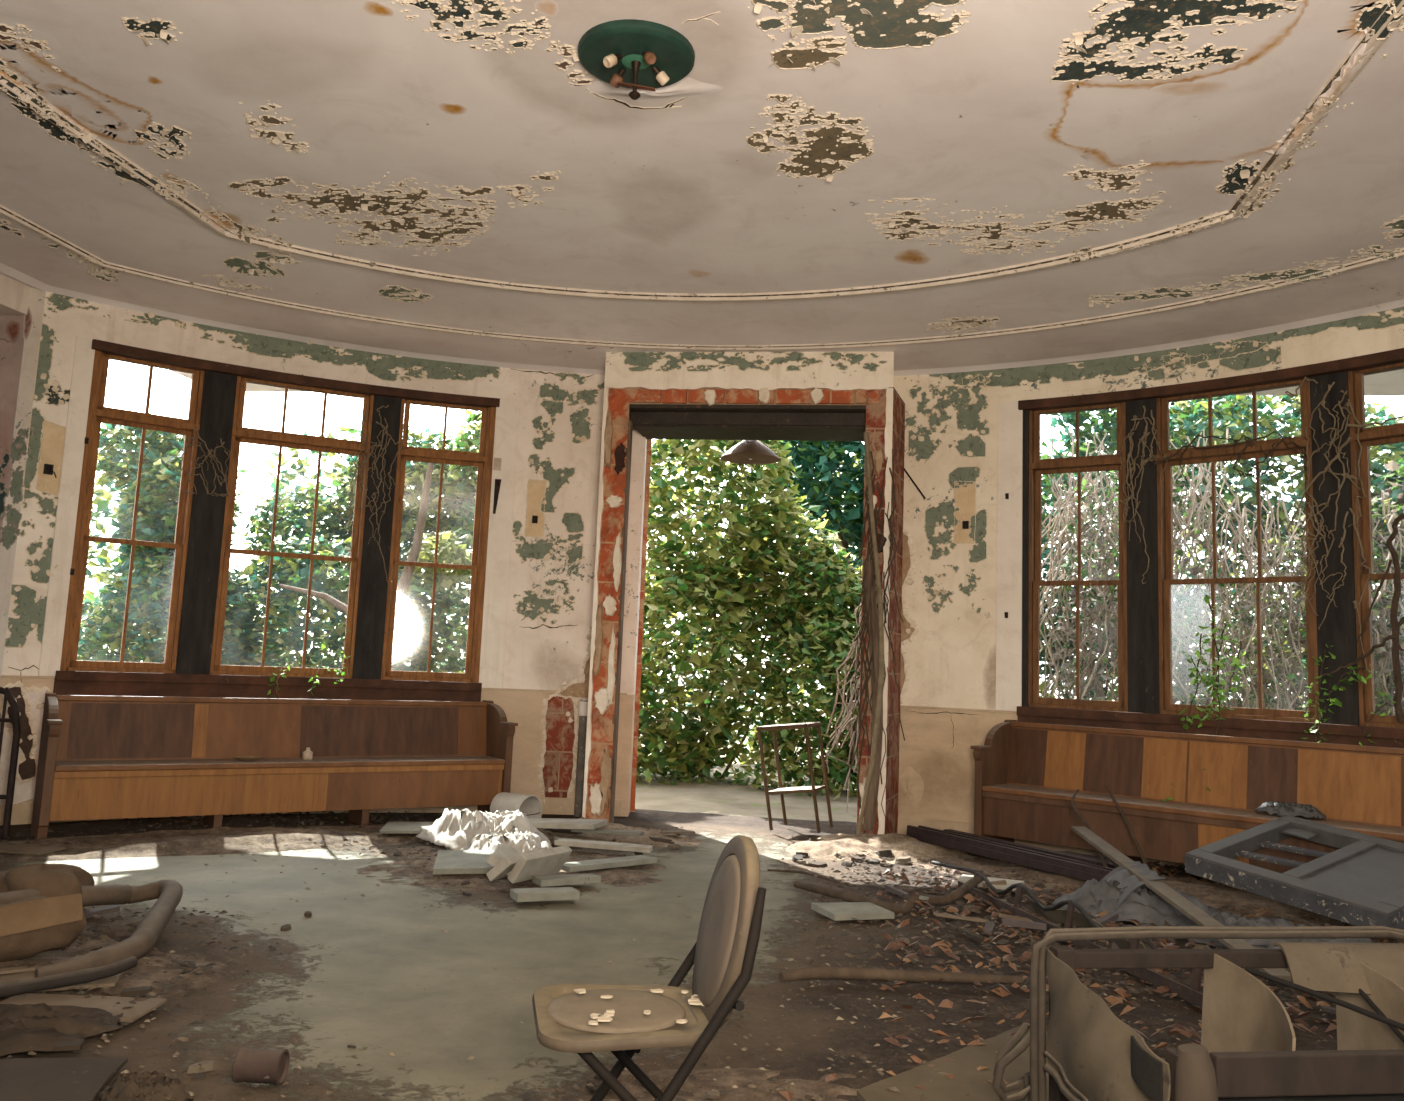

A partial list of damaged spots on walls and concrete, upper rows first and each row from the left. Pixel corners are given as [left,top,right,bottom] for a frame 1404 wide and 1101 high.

damp [0,40,154,146]
peeling [0,58,562,283]
peeling [391,0,594,85]
peeling [745,94,875,182]
peeling [747,0,972,71]
peeling [865,95,1354,264]
peeling [1050,0,1303,85]
damp [1041,0,1379,171]
peeling [622,352,887,373]
peeling [0,293,501,648]
peeling [512,372,605,625]
peeling [900,307,1404,704]